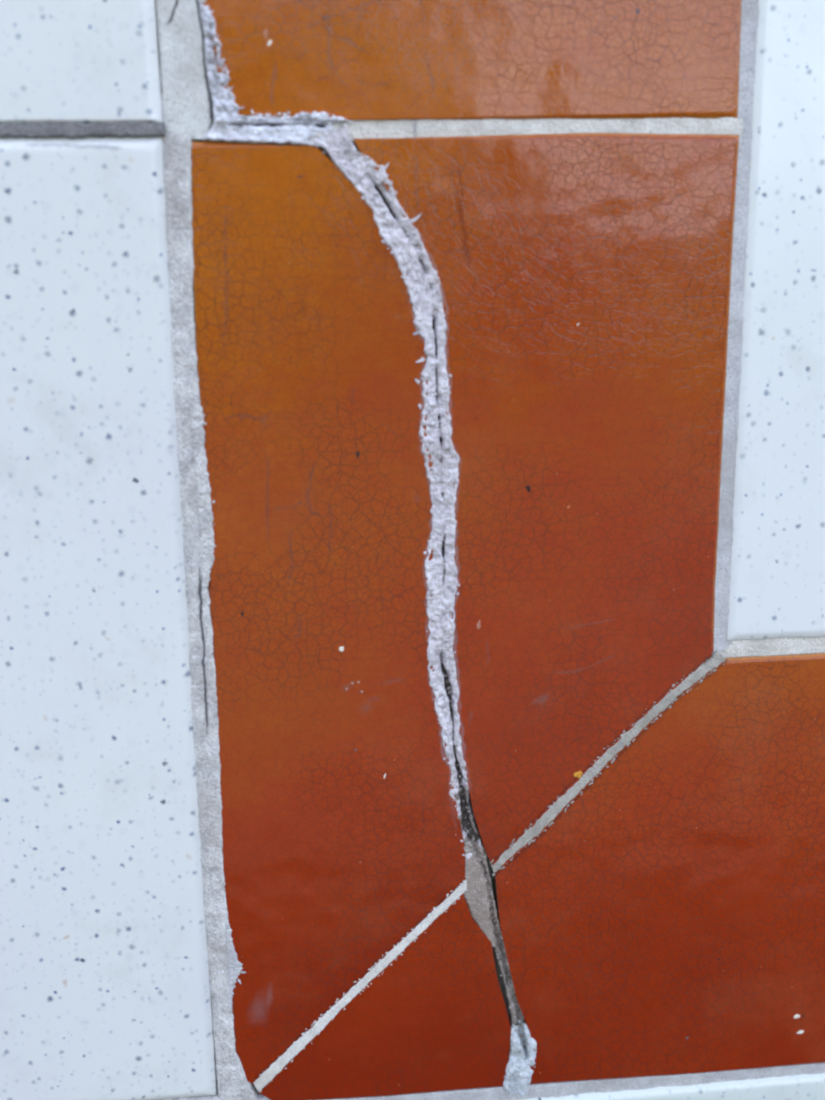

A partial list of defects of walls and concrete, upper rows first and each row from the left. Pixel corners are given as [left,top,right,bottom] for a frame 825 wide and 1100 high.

crack [168,0,527,1049]